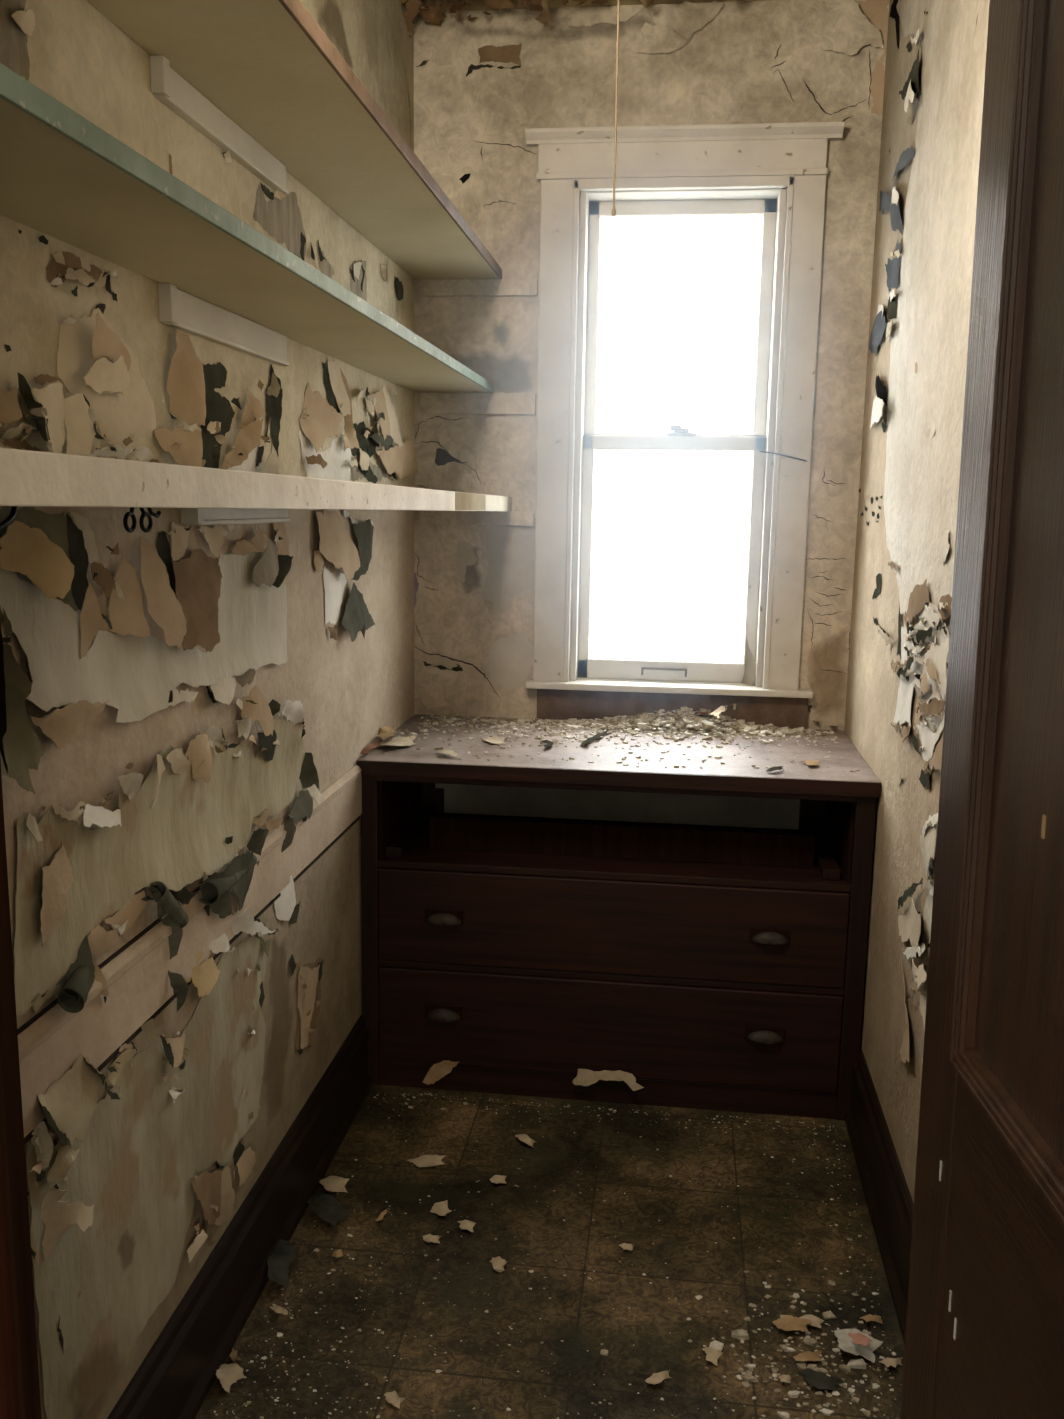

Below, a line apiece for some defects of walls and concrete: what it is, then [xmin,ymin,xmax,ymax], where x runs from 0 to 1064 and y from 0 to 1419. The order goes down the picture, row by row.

flaking render [0,0,35,81]
flaking render [466,43,522,77]
peeling [38,235,117,314]
peeling [0,328,283,475]
peeling [299,360,418,484]
spalling [435,448,467,466]
peeling [806,0,990,790]
peeling [314,509,375,642]
peeling [361,726,418,755]
peeling [0,506,323,1419]
peeling [893,813,938,1066]